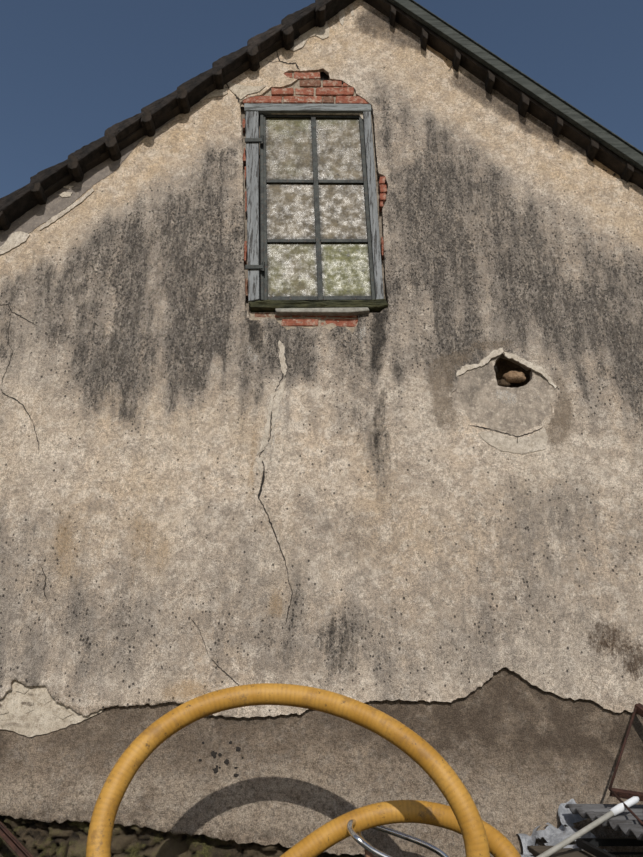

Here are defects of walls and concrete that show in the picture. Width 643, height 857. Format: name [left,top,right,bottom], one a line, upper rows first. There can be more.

flaking render [200,72,372,133]
peeling [0,185,94,255]
flaking render [378,176,387,212]
flaking render [249,312,358,333]
damp [364,309,389,374]
crack [0,304,39,453]
spalling [431,343,571,454]
crack [256,340,293,625]
flaking render [0,680,103,737]
spalling [199,741,244,777]